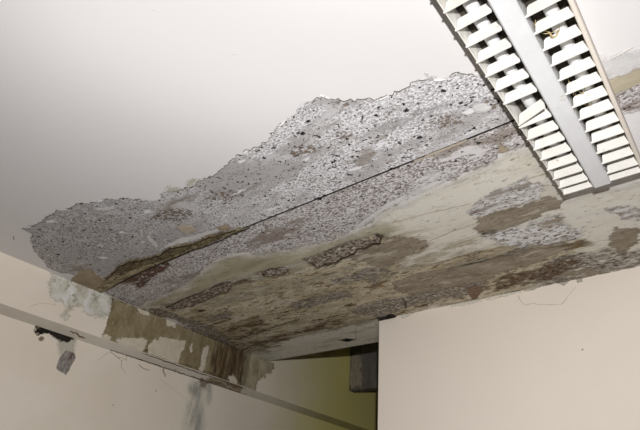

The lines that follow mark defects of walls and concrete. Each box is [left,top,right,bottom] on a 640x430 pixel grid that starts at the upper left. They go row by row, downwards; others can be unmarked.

peeling [615,84,640,114]
peeling [22,72,530,348]
water stain [102,148,640,395]
crack [244,119,515,228]
peeling [291,205,640,322]
peeling [467,175,564,237]